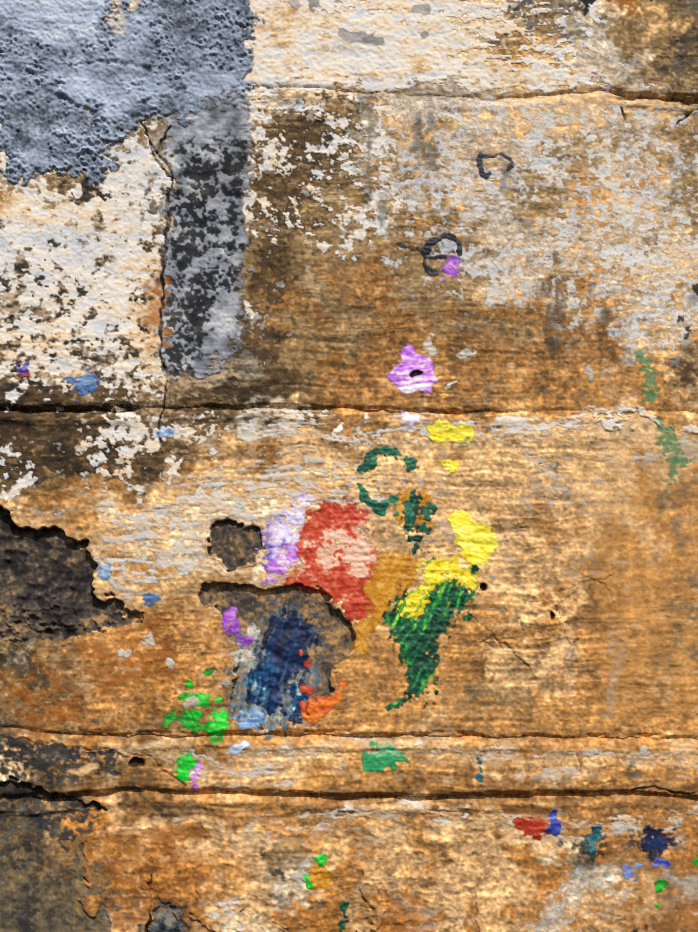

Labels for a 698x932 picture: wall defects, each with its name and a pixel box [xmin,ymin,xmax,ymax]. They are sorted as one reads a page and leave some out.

crack [141,123,172,150]
crack [158,175,173,444]
peeling [0,118,431,737]
peeling [448,404,698,446]
flaking render [68,763,99,777]
peeling [80,734,459,790]
peeling [474,746,515,761]
peeling [534,767,580,780]